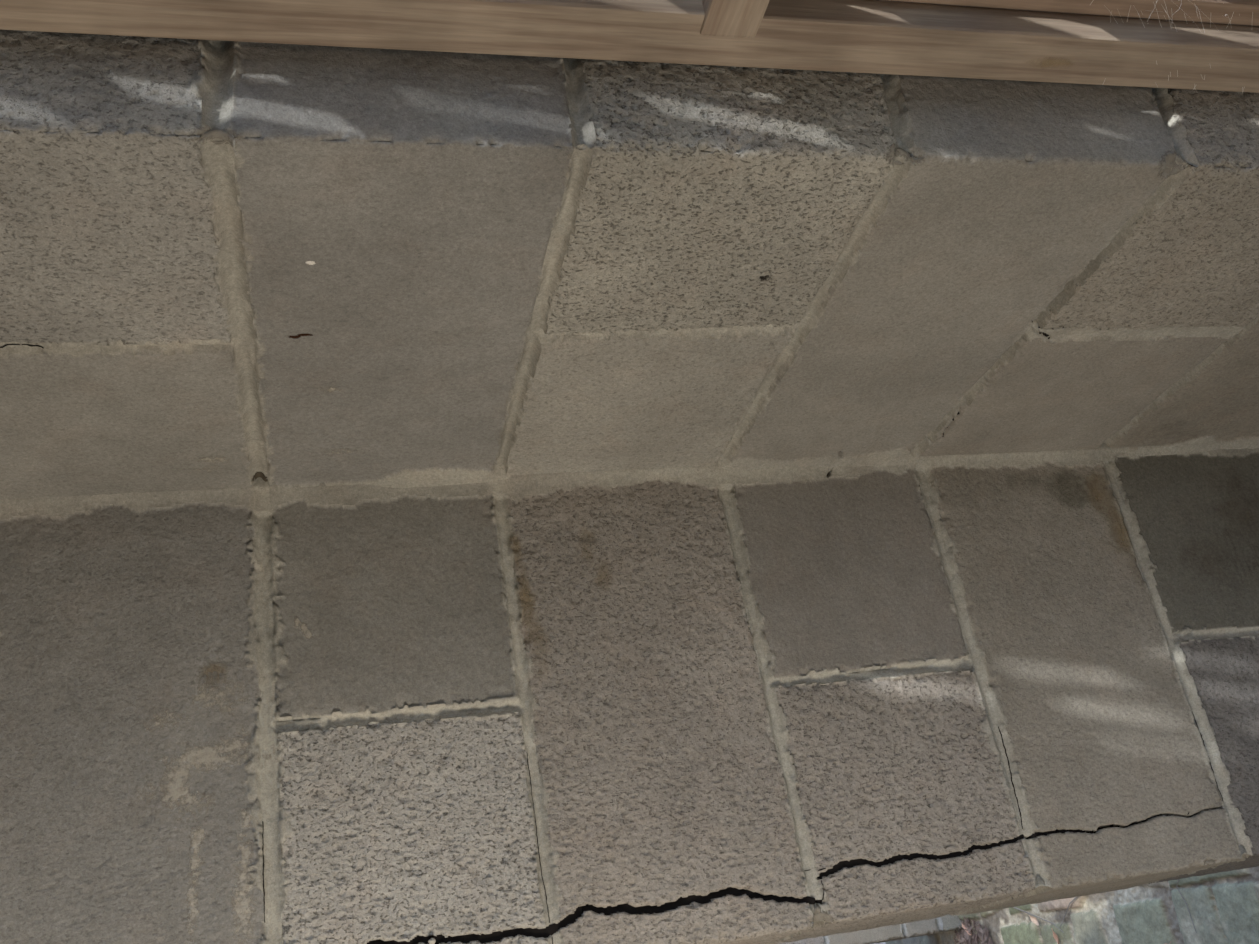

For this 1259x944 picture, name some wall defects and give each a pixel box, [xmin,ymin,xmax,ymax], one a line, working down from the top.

crack [259,821,267,923]
crack [367,712,1223,944]